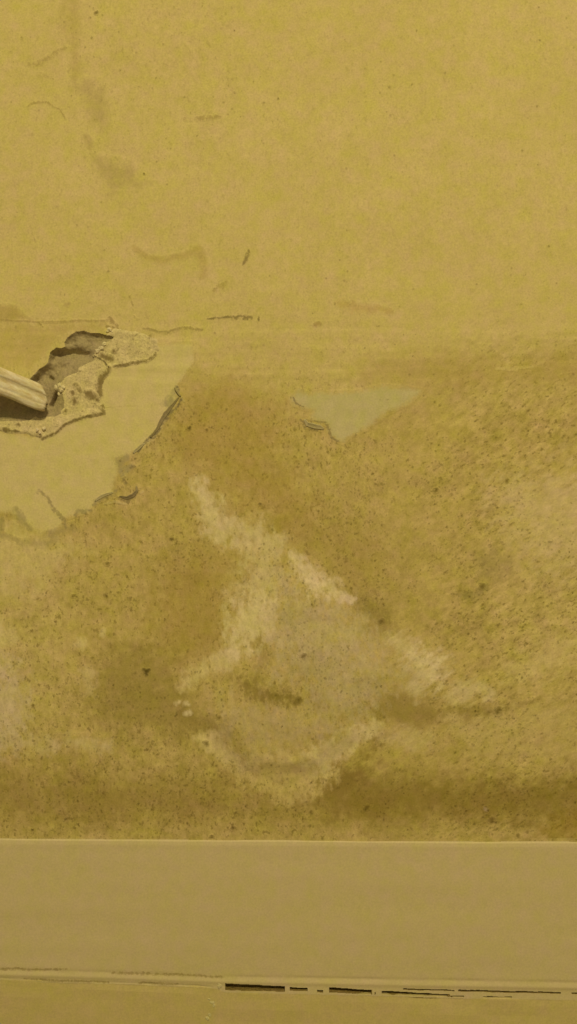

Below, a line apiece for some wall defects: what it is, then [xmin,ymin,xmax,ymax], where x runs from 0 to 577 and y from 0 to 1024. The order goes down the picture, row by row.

damp [0,301,110,374]
damp [334,337,577,400]
peeling [287,383,425,447]
peeling [0,327,199,608]
damp [0,363,577,838]